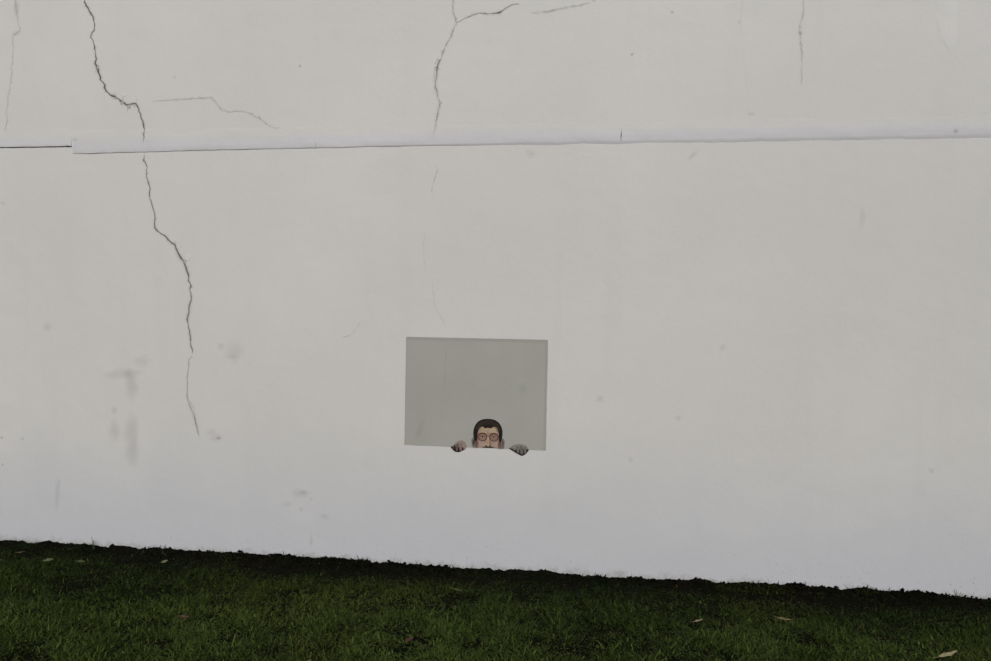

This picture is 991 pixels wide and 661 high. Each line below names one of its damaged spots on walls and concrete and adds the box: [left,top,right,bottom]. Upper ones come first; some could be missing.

crack [84,1,193,352]